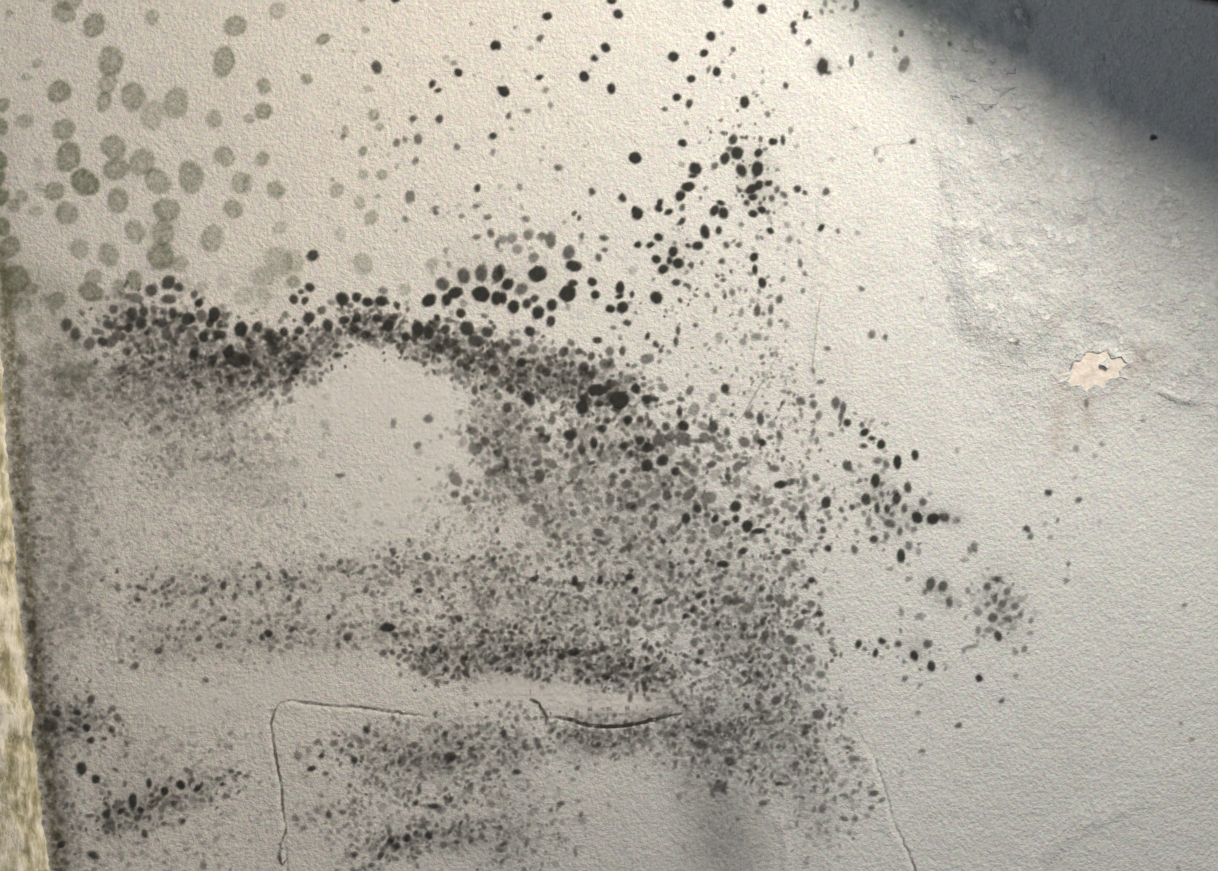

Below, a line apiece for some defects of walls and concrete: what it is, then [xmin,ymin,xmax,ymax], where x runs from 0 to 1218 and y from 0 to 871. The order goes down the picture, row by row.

leakage [580,43,611,81]
leakage [687,31,721,82]
leakage [818,58,830,74]
leakage [47,136,125,194]
leakage [619,112,807,311]
leakage [62,211,952,745]
leakage [0,152,120,871]
leakage [985,576,1017,640]
leakage [308,735,363,775]
leakage [85,793,164,837]
leakage [147,769,248,808]
leakage [367,785,467,866]